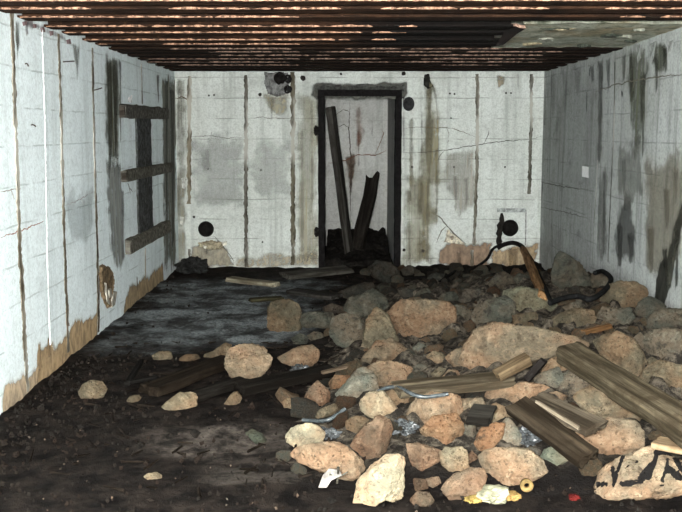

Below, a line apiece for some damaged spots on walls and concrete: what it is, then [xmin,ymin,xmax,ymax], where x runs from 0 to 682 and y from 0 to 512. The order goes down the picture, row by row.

leakage [106,56,124,268]
rust [346,154,355,186]
crack [336,104,385,218]
crack [403,127,541,159]
leakage [592,60,610,161]
leakage [623,44,667,155]
spalling [198,240,227,250]
spalling [444,229,465,245]
leakage [614,193,635,265]
leakage [645,157,682,304]
spalling [99,264,117,309]